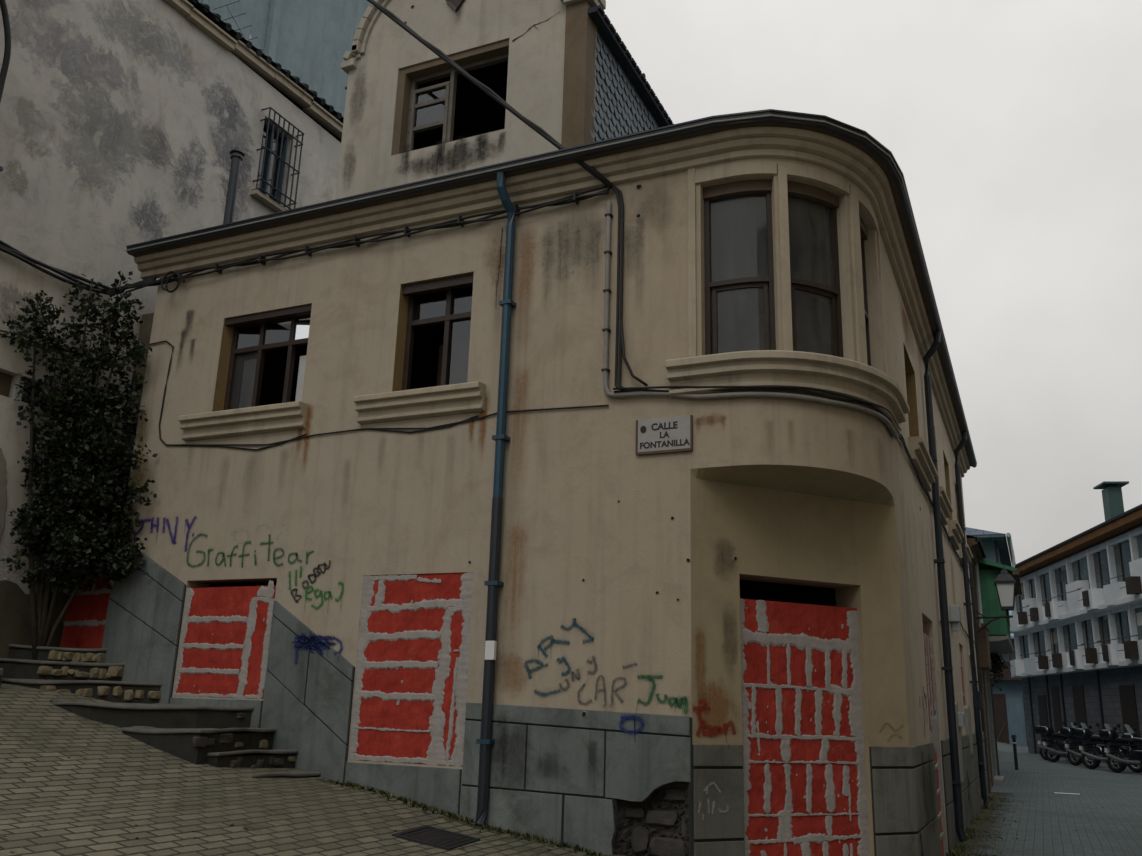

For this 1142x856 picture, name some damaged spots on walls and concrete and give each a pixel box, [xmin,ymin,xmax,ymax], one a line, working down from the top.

water stain [403,135,486,173]
flaking render [625,789,687,856]